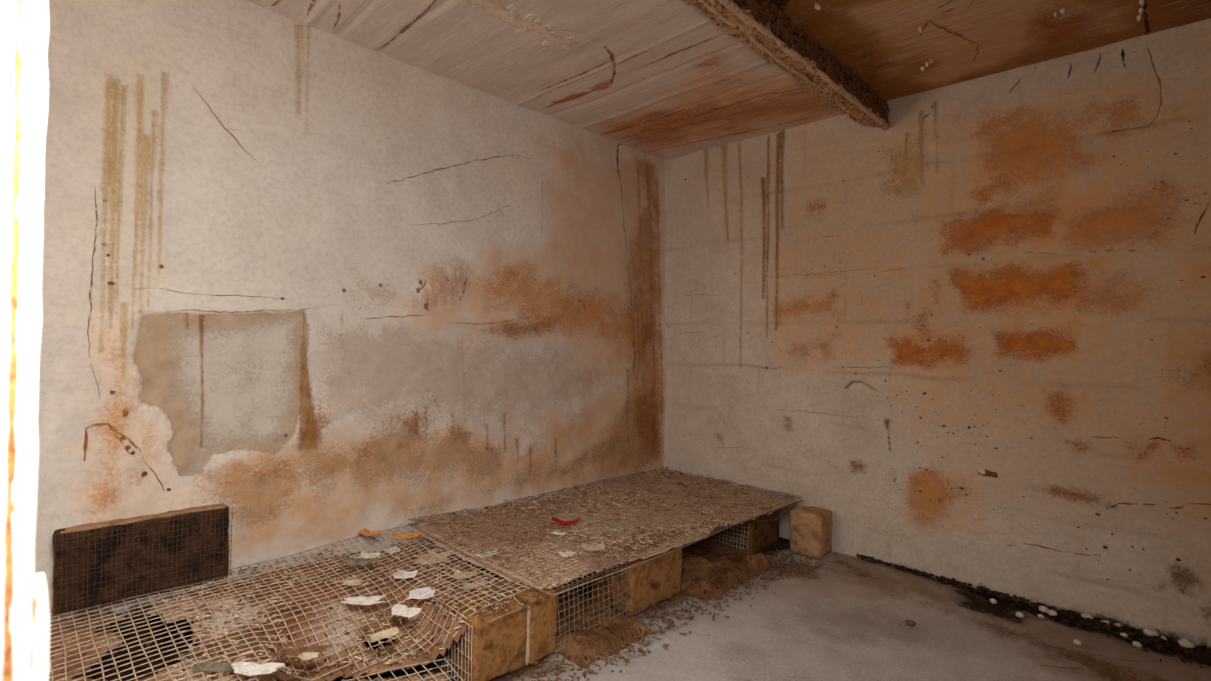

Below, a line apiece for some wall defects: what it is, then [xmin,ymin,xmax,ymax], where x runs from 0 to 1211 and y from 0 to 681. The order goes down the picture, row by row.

crack [196,90,259,163]
rust [554,83,609,104]
spalling [686,0,891,131]
crack [1068,0,1162,134]
crack [387,155,526,184]
crack [420,201,516,225]
rust [943,183,1054,255]
rust [952,263,1083,309]
damp [214,162,662,519]
rust [996,331,1075,359]
flaking render [121,297,308,491]
damp [897,566,1211,681]